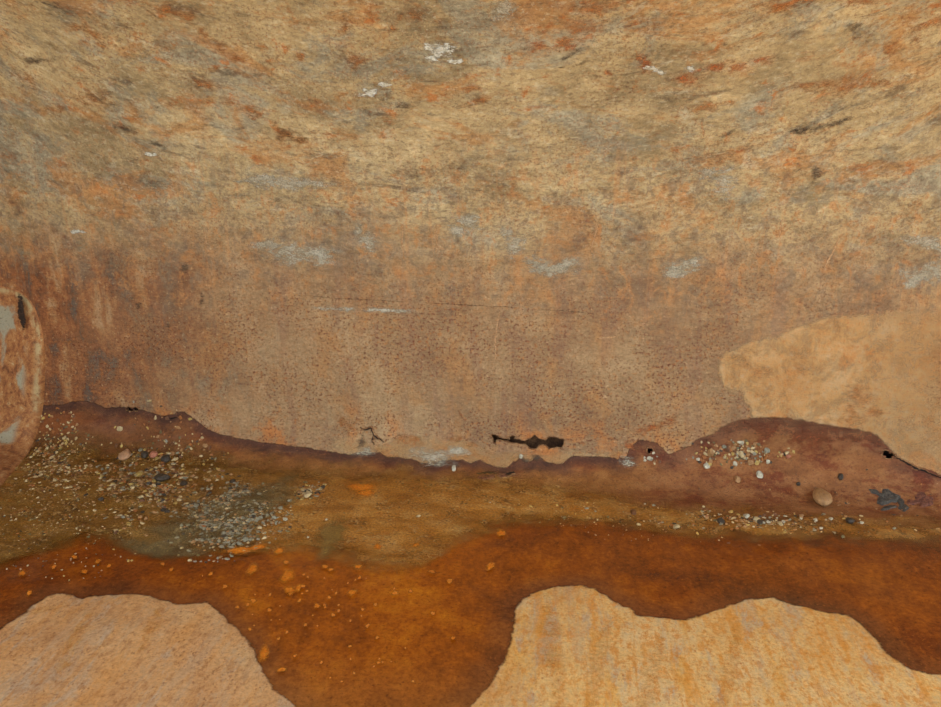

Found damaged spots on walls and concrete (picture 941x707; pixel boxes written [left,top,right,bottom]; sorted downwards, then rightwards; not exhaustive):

corrosion [676,57,772,83]
crack [360,426,384,445]
crack [894,455,941,478]
water stain [0,312,941,707]